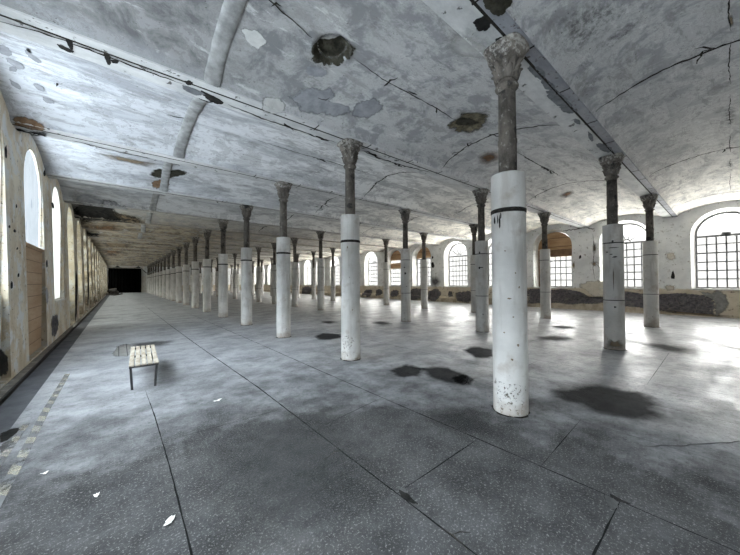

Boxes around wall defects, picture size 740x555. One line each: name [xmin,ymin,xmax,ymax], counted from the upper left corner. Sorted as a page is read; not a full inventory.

spalling [473,0,513,31]
hole [307,35,356,77]
crack [601,0,740,107]
crack [357,60,455,120]
crack [228,104,334,142]
spalling [447,113,489,133]
crack [261,133,498,195]
flaking render [551,281,603,305]
flaking render [659,290,729,316]
leakage [465,347,493,358]
leakage [392,365,474,385]
leakage [554,386,661,419]